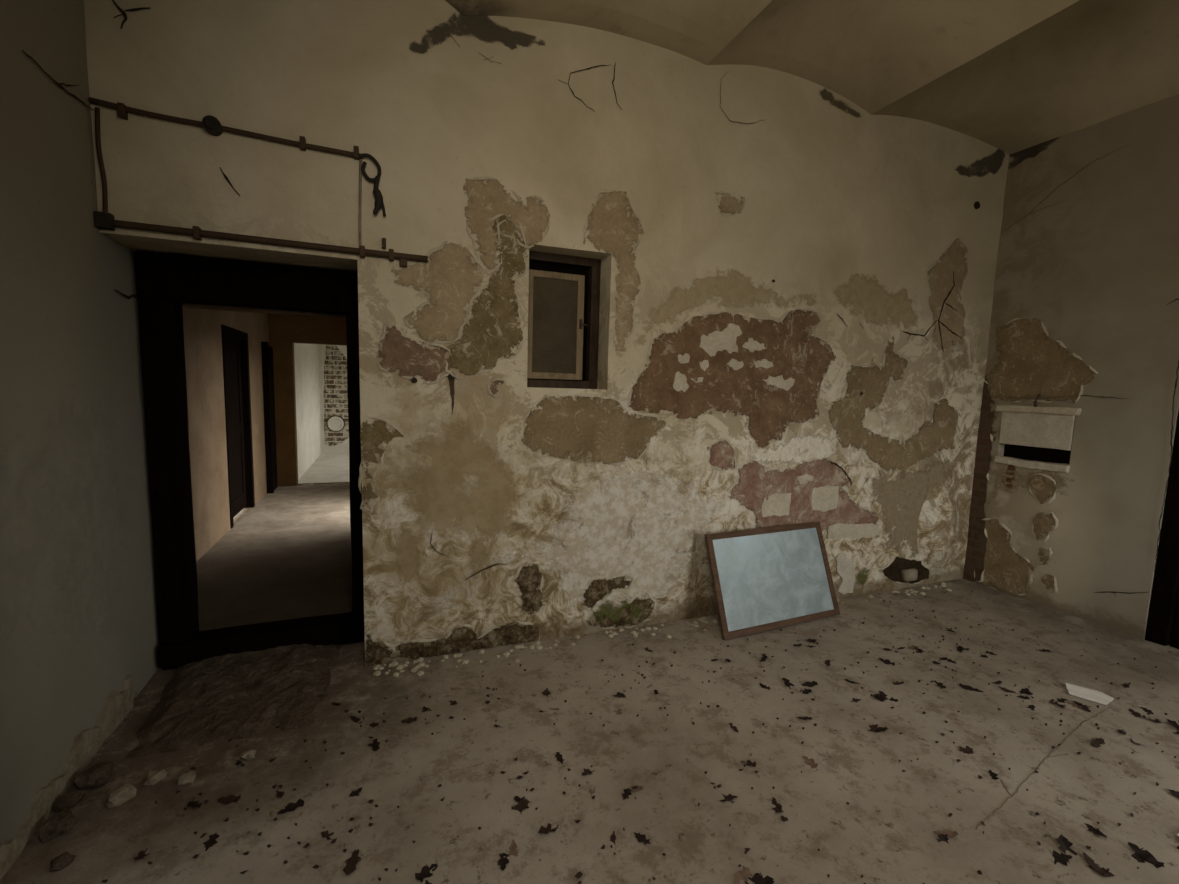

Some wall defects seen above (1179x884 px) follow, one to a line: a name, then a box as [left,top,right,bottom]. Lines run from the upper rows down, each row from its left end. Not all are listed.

crack [112,0,151,29]
crack [559,63,622,112]
peeling [377,177,550,414]
peeling [583,189,644,351]
crack [903,271,962,350]
peeling [927,238,968,352]
peeling [521,308,959,471]
flaking render [707,438,879,539]
flaking render [963,379,1058,596]
spalling [364,561,544,666]
peeling [834,553,855,594]
spalling [882,555,930,584]